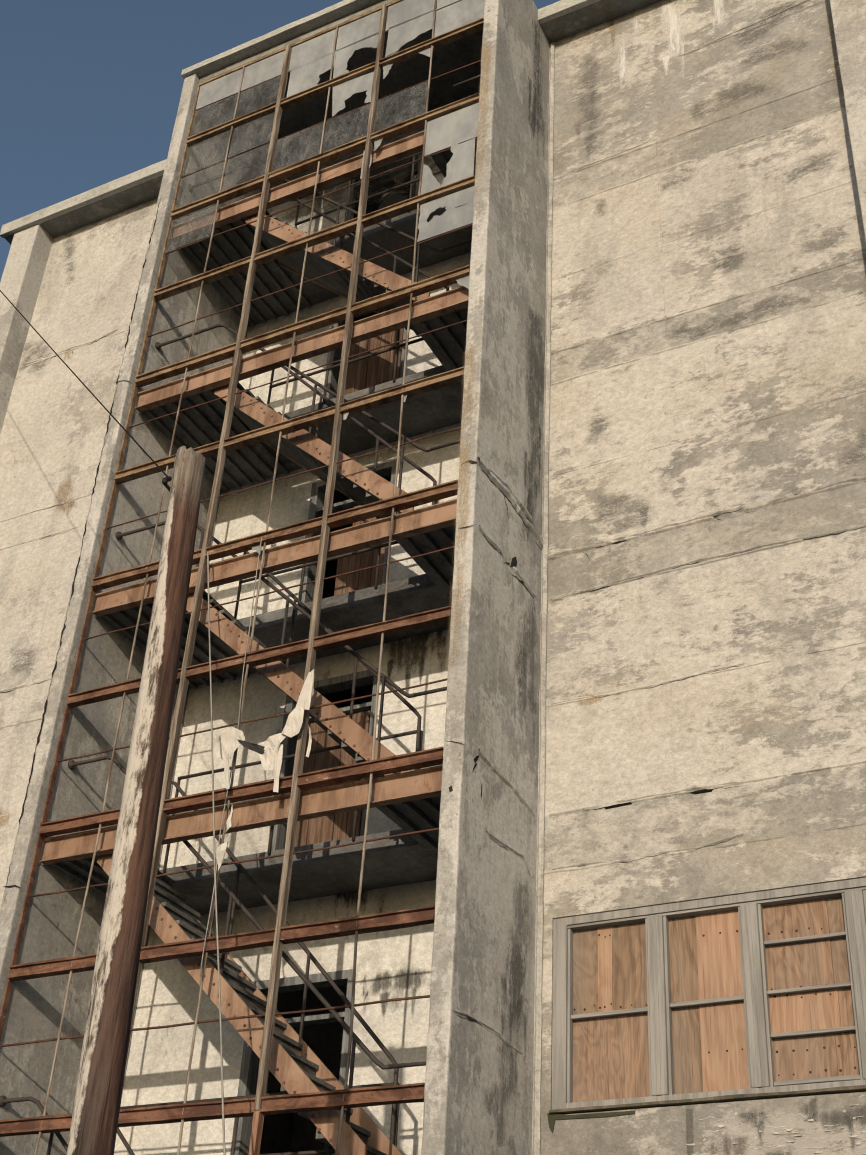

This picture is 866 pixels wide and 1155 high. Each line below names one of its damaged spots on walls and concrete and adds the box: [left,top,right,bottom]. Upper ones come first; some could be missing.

leakage [662,4,684,72]
leakage [713,0,723,25]
crack [0,198,161,888]
crack [459,457,866,602]
crack [446,741,743,817]
crack [485,828,743,878]
leakage [363,971,422,1014]
leakage [486,885,529,1155]
leakage [805,1098,866,1145]